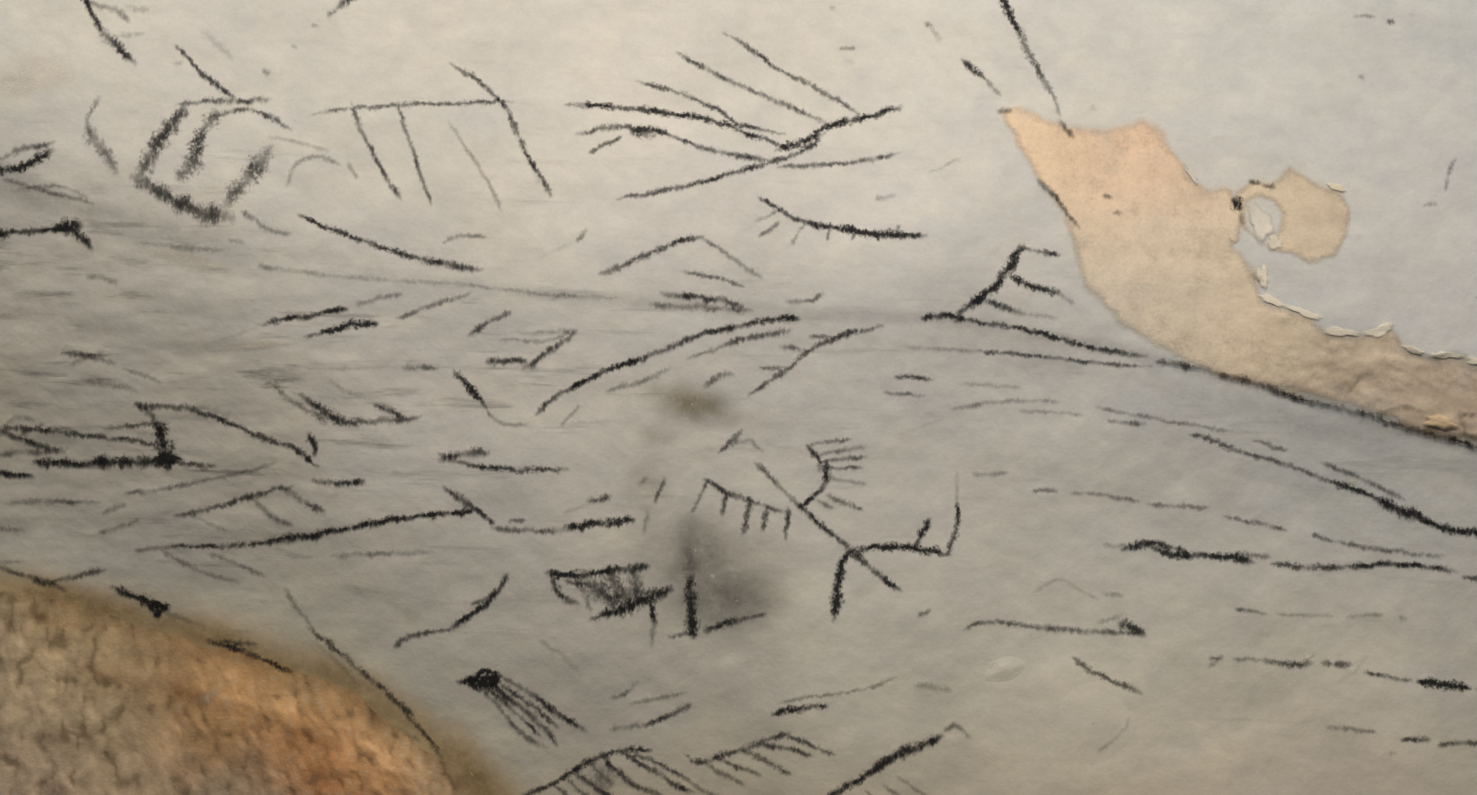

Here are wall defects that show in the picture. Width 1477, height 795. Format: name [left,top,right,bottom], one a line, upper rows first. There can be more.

spalling [1004,108,1477,441]